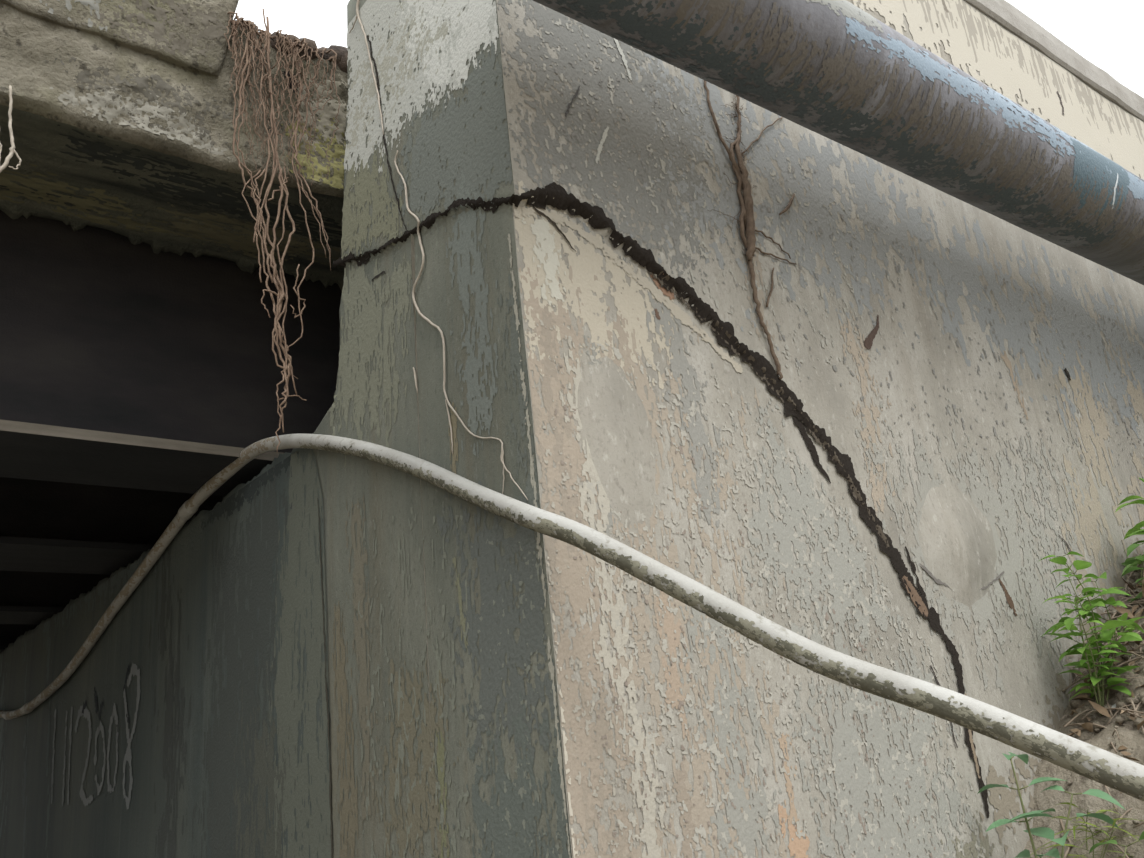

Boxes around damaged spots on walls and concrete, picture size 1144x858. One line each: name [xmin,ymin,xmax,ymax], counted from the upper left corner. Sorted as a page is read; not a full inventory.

water stain [55,0,1144,689]
crack [333,35,1004,695]
crack [951,722,989,818]